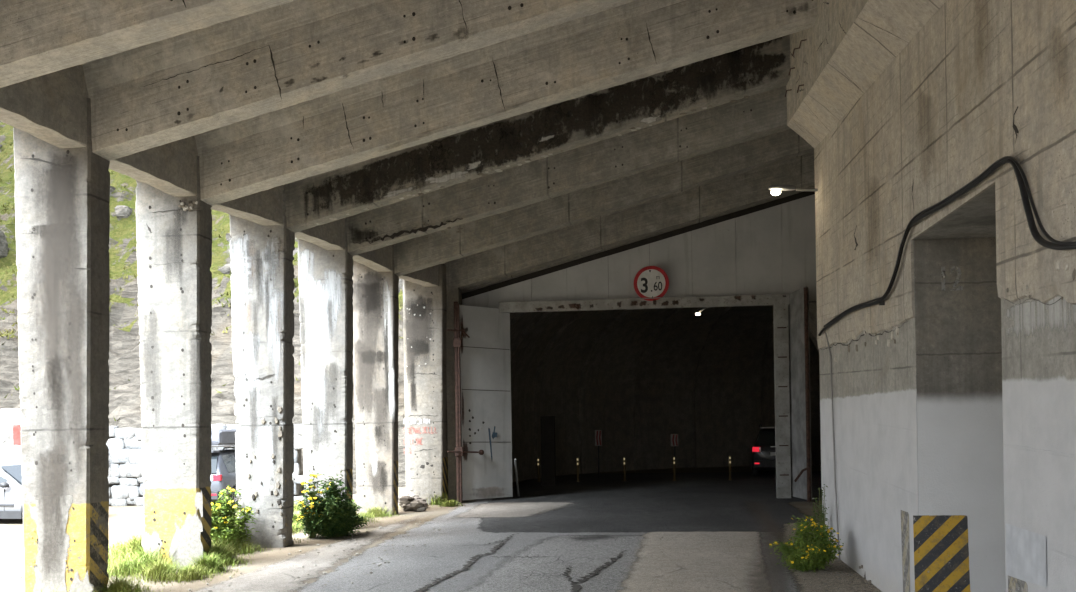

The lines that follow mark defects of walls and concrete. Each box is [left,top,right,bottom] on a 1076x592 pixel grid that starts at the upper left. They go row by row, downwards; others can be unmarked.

crack [143,45,282,100]
spalling [351,218,463,244]
damp [230,234,283,493]
damp [298,249,341,435]
damp [355,271,432,493]
peeling [29,495,93,592]
peeling [141,491,203,568]